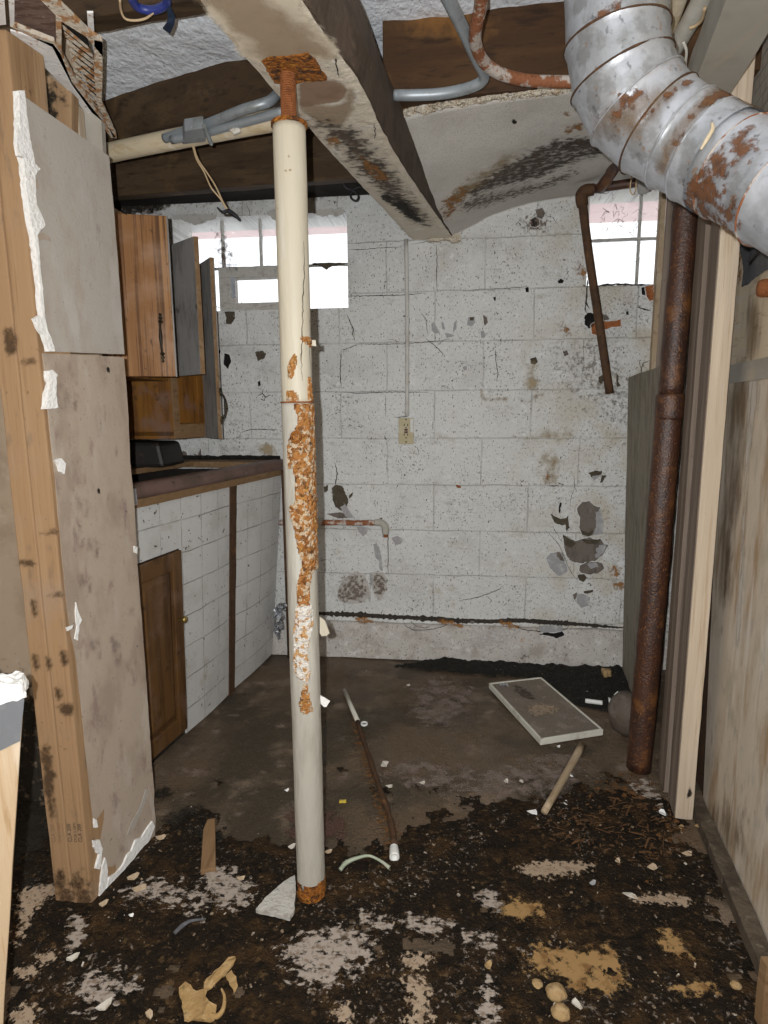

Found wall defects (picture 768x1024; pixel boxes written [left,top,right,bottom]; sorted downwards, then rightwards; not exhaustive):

water stain [300,81,430,226]
water stain [455,138,603,211]
spalling [529,208,545,228]
spalling [219,350,232,369]
peeling [324,484,388,604]
water stain [338,575,388,603]
peeling [546,500,609,608]